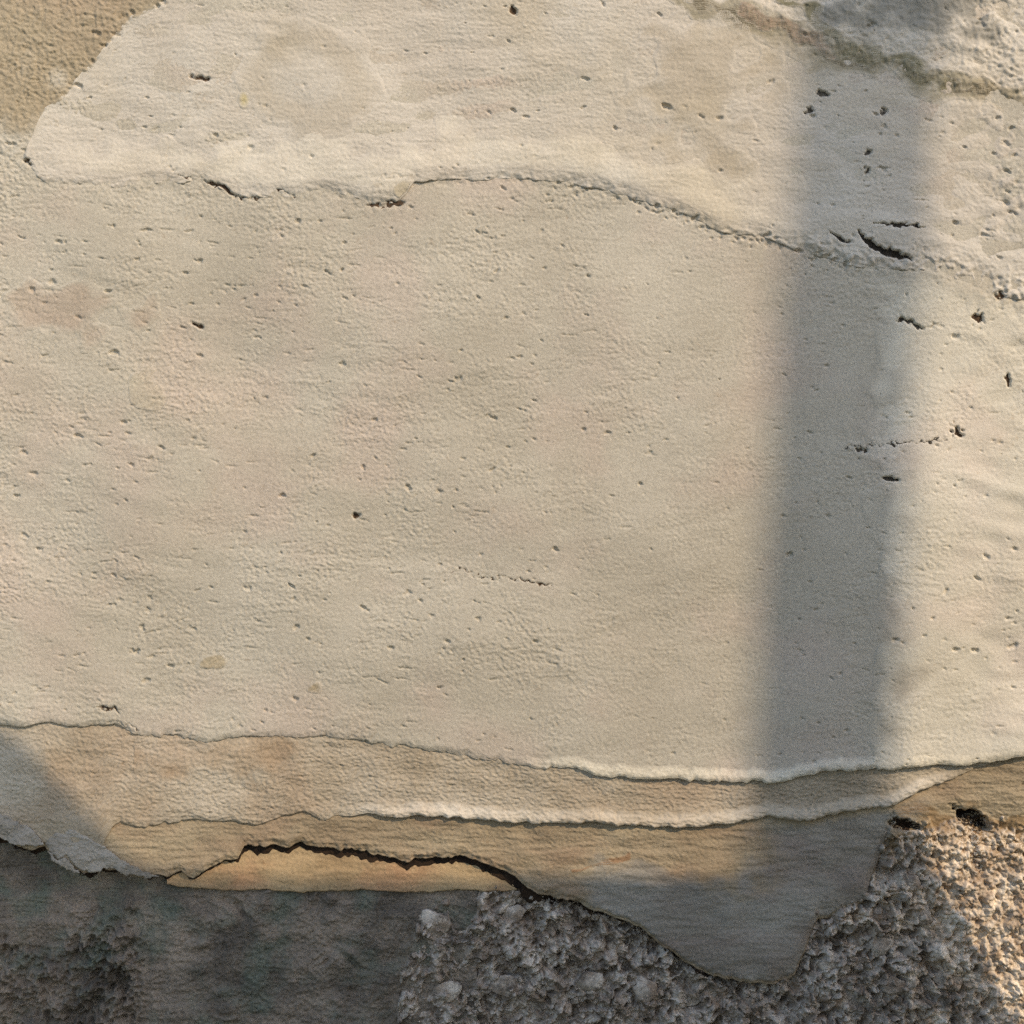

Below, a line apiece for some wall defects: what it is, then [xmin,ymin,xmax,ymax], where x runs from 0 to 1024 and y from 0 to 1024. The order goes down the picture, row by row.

crack [185,177,295,201]
crack [369,200,403,208]
crack [833,222,922,260]
crack [0,838,46,854]
peeling [0,813,159,879]
crack [75,868,118,878]
crack [147,842,738,982]
spalling [397,813,1024,1024]